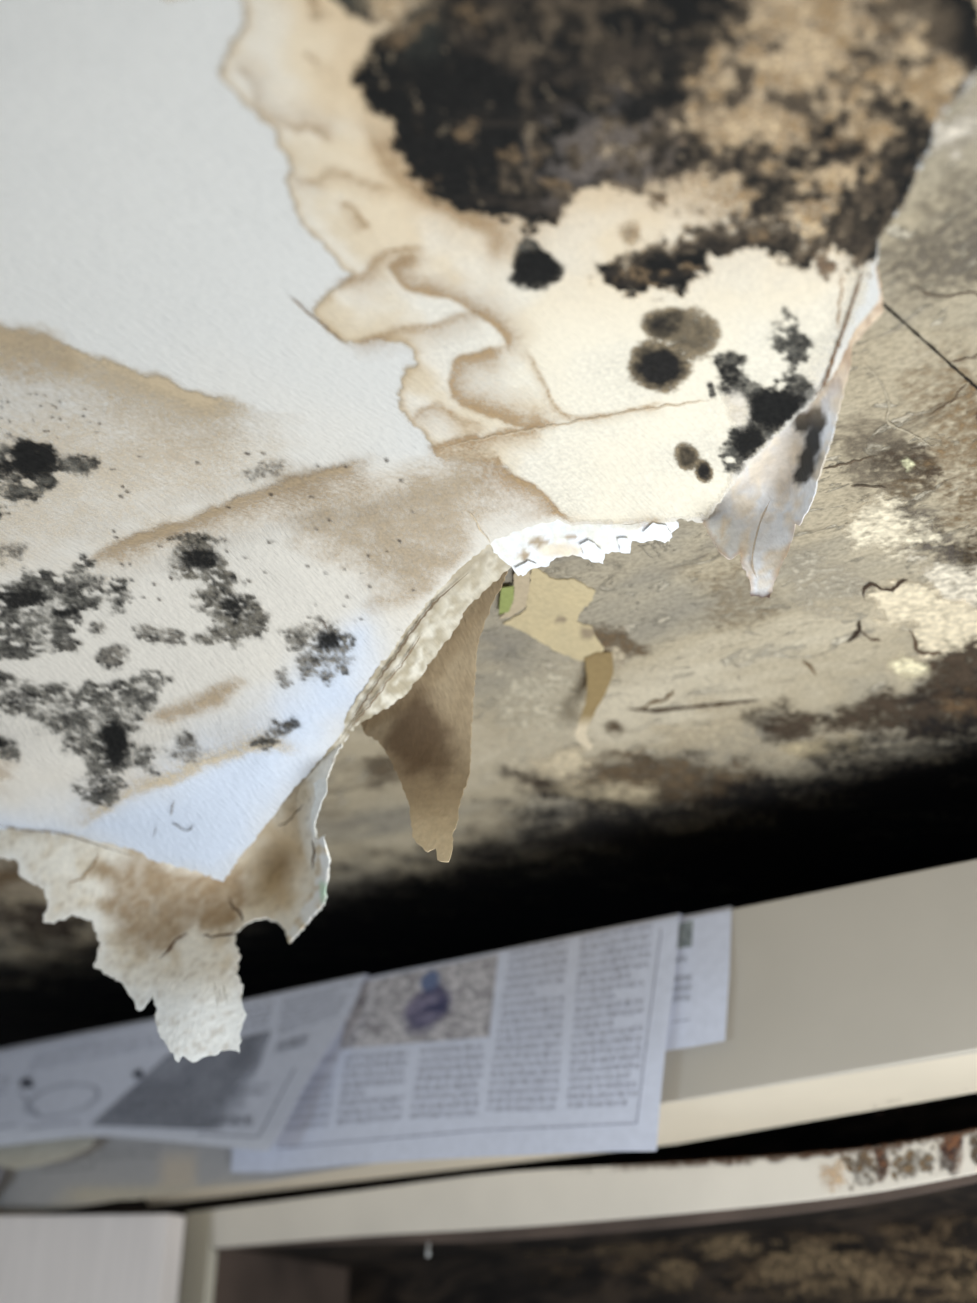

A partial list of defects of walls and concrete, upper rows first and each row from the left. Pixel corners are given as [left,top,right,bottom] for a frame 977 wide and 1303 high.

crack [915,285,977,297]
crack [882,303,977,416]
damp [0,0,977,813]
peeling [703,265,977,677]
peeling [580,540,603,564]
peeling [618,538,631,553]
peeling [643,522,672,543]
peeling [496,561,662,807]
peeling [780,736,859,759]
peeling [0,858,44,905]
rust [623,1129,977,1191]